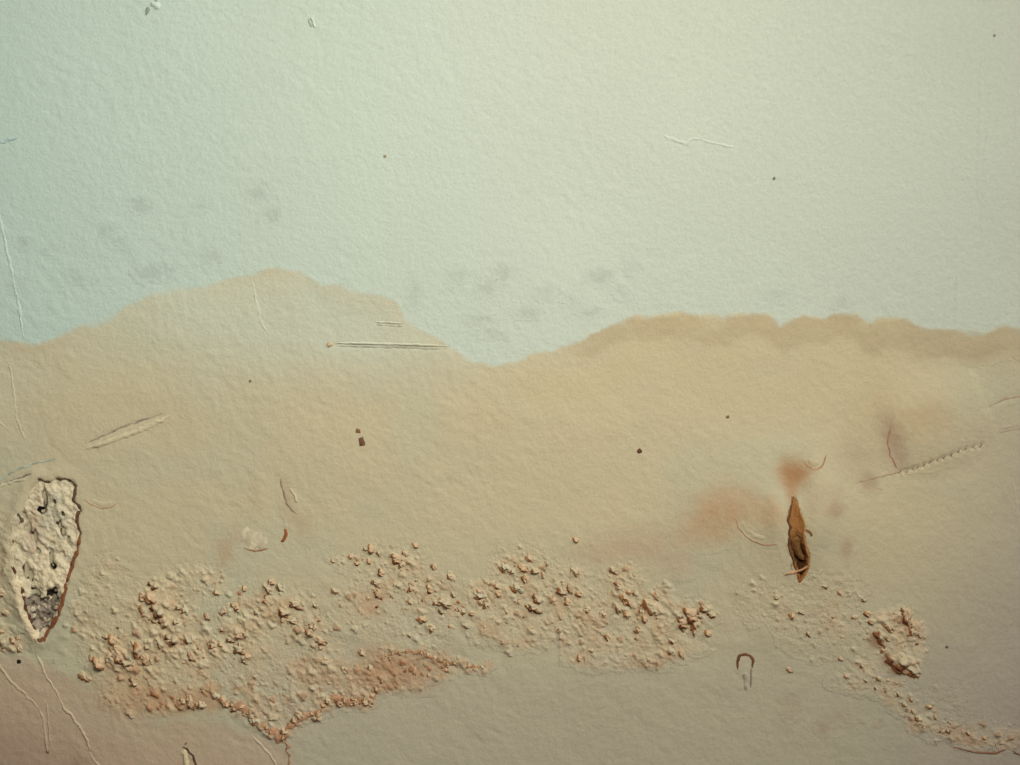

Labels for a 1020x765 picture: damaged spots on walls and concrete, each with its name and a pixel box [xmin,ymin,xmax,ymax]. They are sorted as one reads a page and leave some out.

spalling [0,477,932,765]
leakage [0,245,1020,765]
corrosion [657,448,821,556]